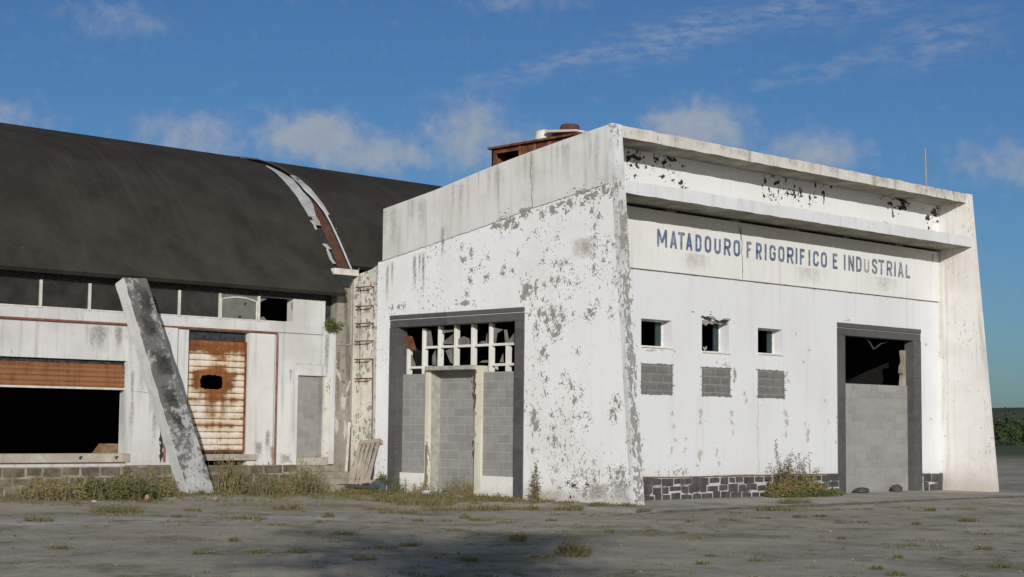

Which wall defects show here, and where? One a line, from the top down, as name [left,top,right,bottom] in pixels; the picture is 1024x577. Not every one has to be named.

peeling [758,175,833,206]
peeling [879,196,911,223]
corrosion [311,200,349,269]
damp [136,286,156,335]
peeling [455,148,722,505]
damp [153,351,173,374]
peeling [296,268,406,457]
damp [163,386,184,430]